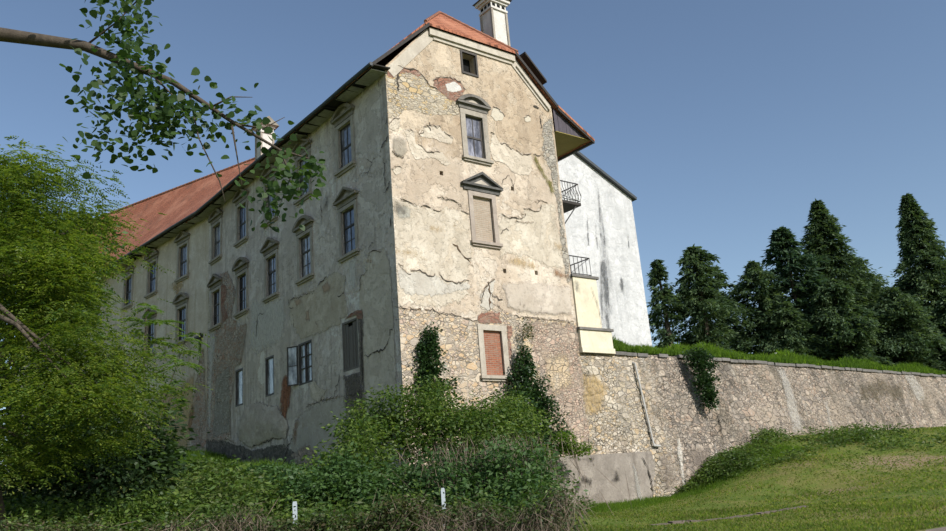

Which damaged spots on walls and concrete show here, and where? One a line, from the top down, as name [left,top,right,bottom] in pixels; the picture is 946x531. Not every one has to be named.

spalling [197,271,359,469]
spalling [386,65,466,165]
spalling [288,196,591,466]
crack [452,243,503,310]
peeling [490,106,572,283]
leakage [601,261,609,329]